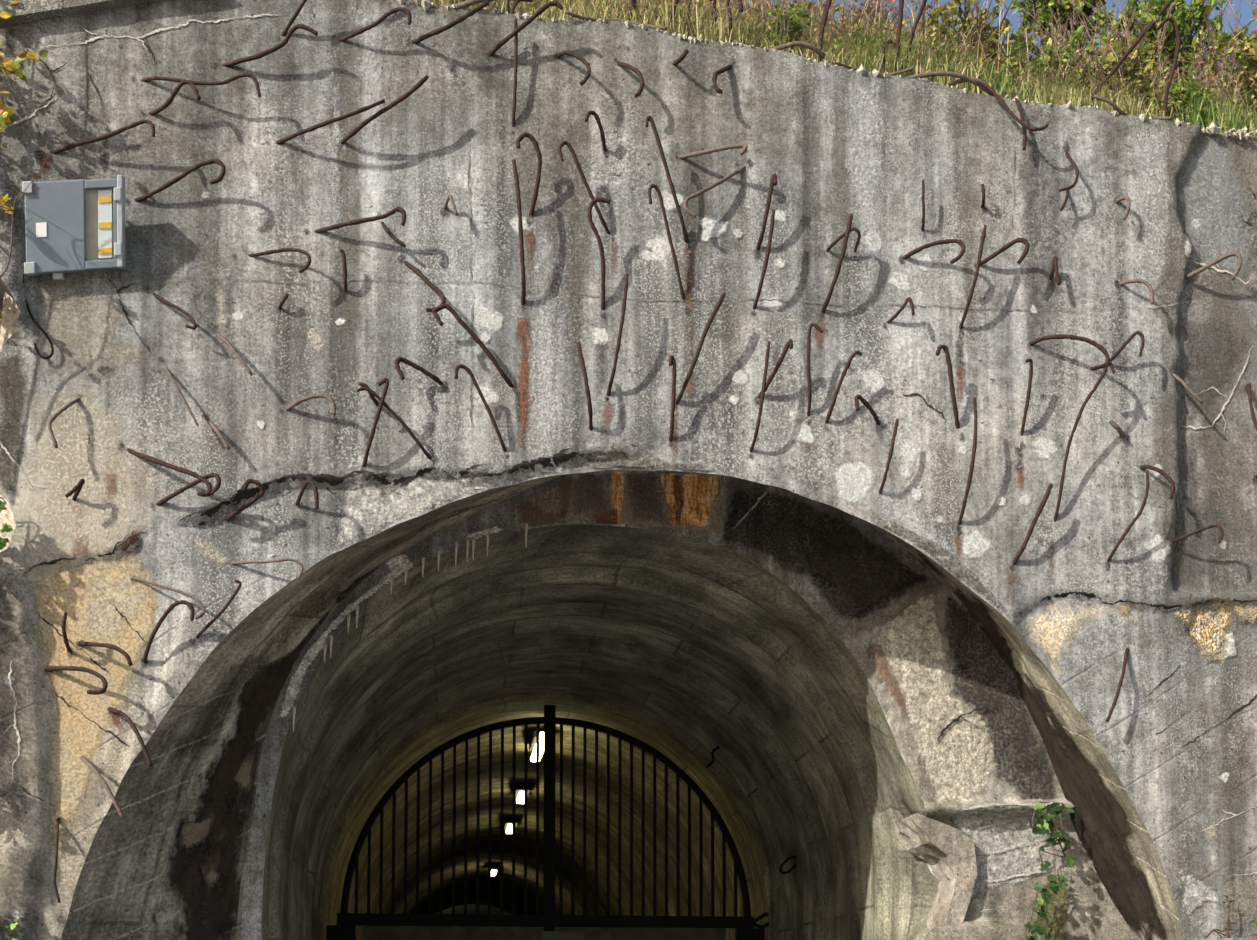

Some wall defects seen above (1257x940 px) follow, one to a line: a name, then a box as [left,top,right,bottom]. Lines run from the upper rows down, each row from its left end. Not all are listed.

crack [0,13,285,148]
rust [515,319,533,445]
crack [105,137,1067,528]
spalling [24,284,253,903]
rust [596,470,624,525]
rust [660,470,718,527]
damp [466,470,943,621]
crack [1020,591,1257,614]
spalling [1175,595,1257,662]
damp [152,499,499,940]
spalling [877,592,1058,902]
damp [944,589,1165,940]